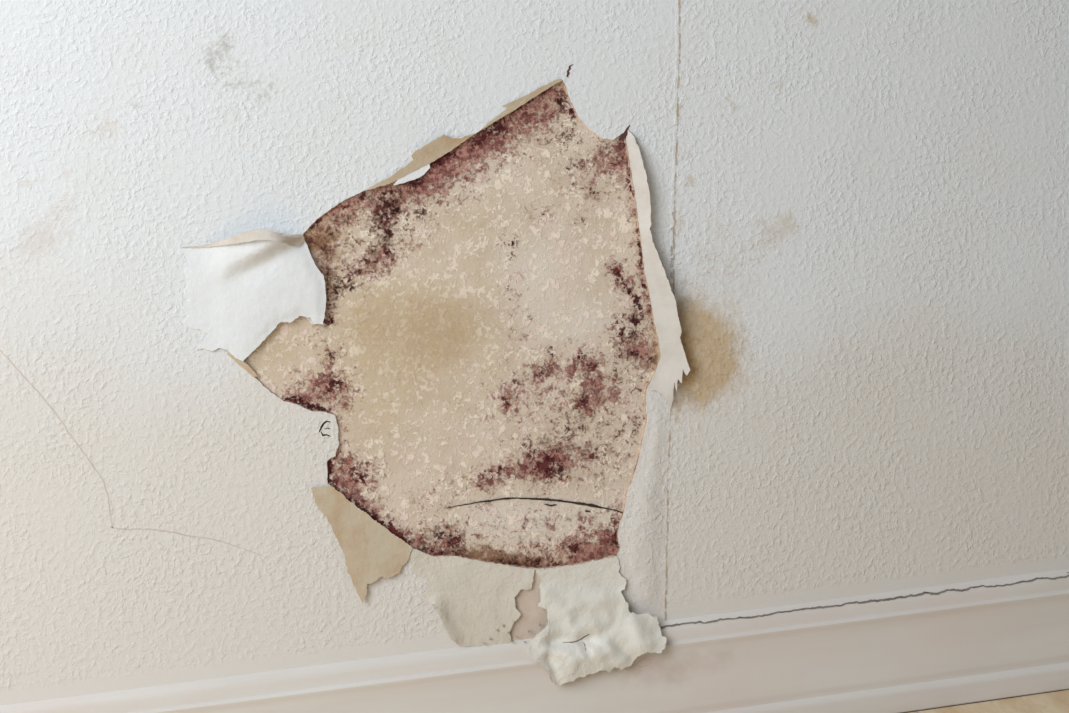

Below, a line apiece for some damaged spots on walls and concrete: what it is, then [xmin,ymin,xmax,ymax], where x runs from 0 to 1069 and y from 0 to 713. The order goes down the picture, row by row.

crack [670,0,681,293]
peeling [179,79,690,686]
water stain [281,83,622,568]
crack [448,497,623,513]
water stain [448,139,661,511]
water stain [677,308,736,403]
crack [661,403,1069,629]
crack [902,689,1069,713]